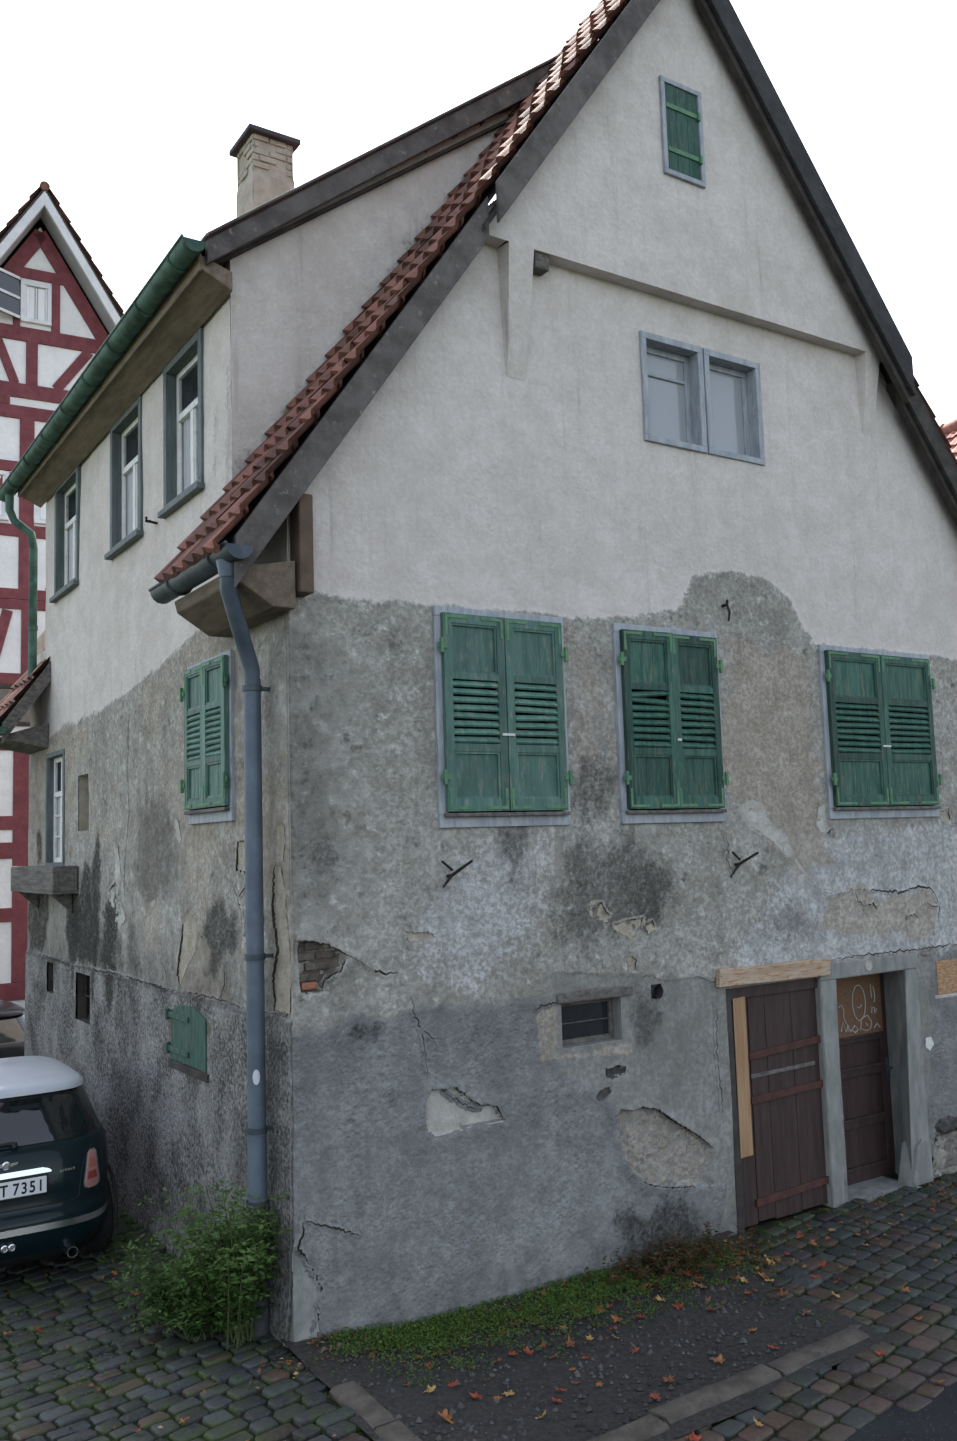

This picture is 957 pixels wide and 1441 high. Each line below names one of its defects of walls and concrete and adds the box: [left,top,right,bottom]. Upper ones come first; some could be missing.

leakage [66,833,139,1014]
flaking render [270,865,383,1014]
peeling [587,898,659,973]
flaking render [416,1077,508,1137]
flaking render [596,1059,715,1198]